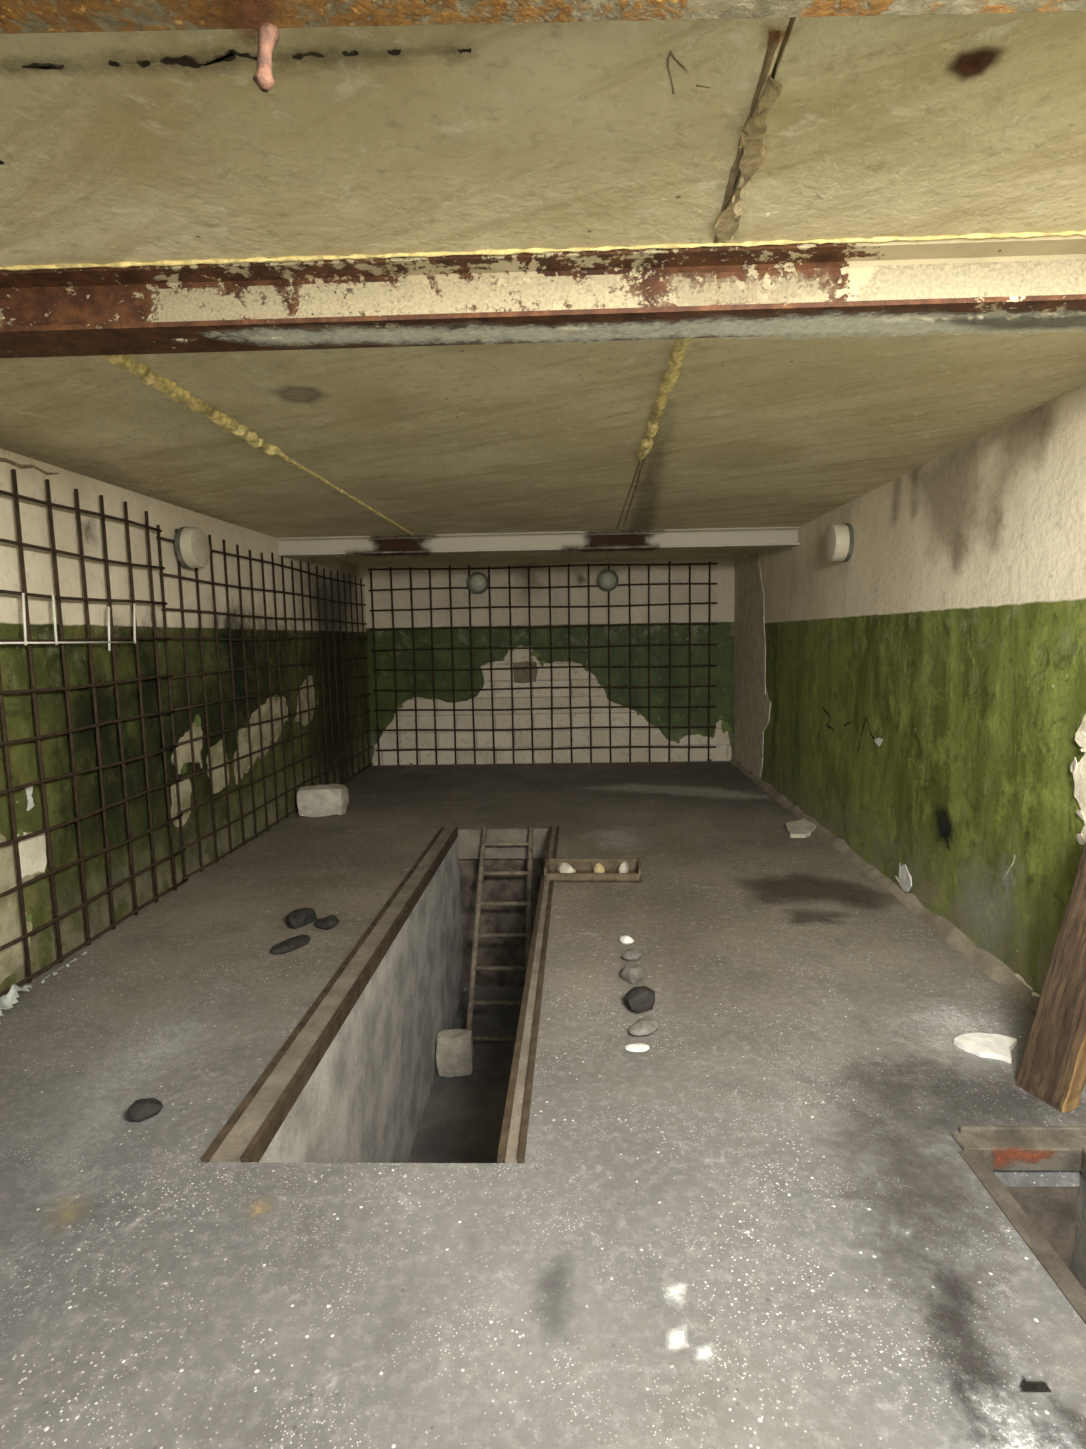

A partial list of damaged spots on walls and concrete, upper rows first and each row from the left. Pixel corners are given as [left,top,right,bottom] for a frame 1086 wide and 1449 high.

rust [252,22,281,92]
crack [667,50,711,95]
crack [713,30,780,243]
crack [623,458,646,526]
water stain [914,453,973,558]
flaking render [372,553,771,778]
peeling [171,675,318,828]
flaking render [1070,714,1086,845]